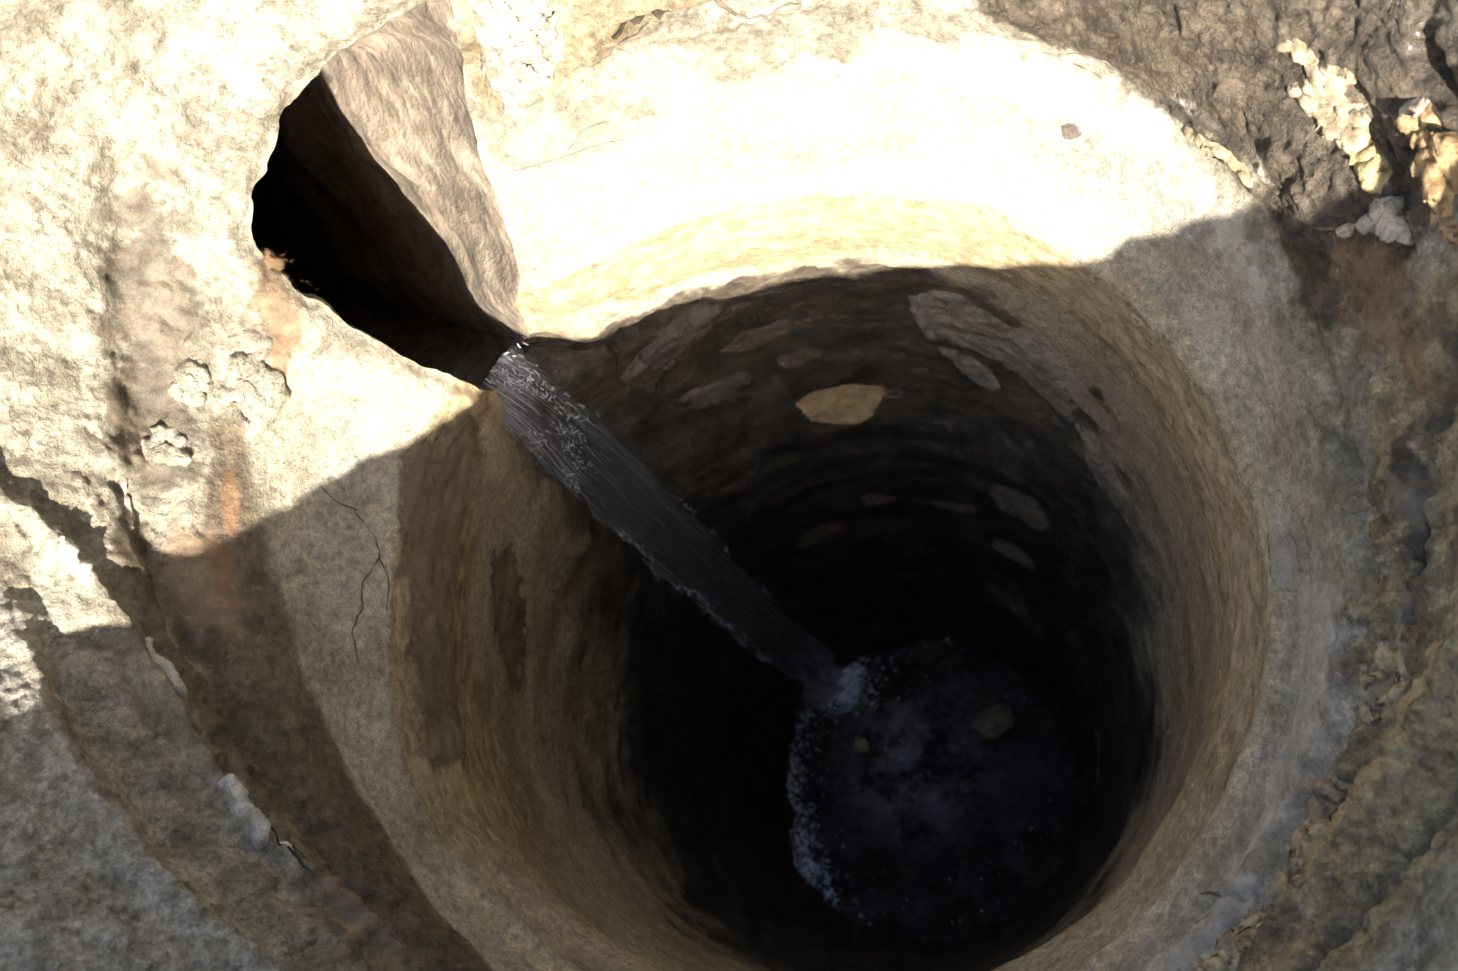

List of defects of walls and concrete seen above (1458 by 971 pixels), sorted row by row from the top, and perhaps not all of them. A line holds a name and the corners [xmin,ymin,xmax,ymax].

rust [247,255,302,377]
crack [320,486,390,663]